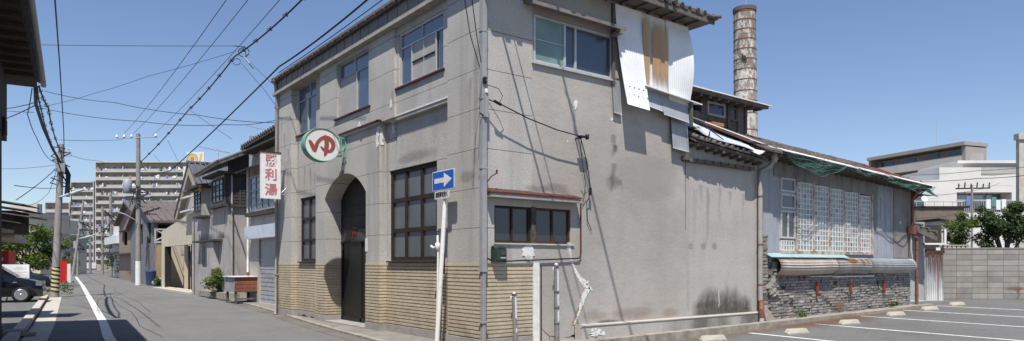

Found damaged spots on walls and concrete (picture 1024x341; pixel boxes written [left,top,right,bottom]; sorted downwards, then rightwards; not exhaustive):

rust [643,19,668,85]
water stain [697,289,749,315]